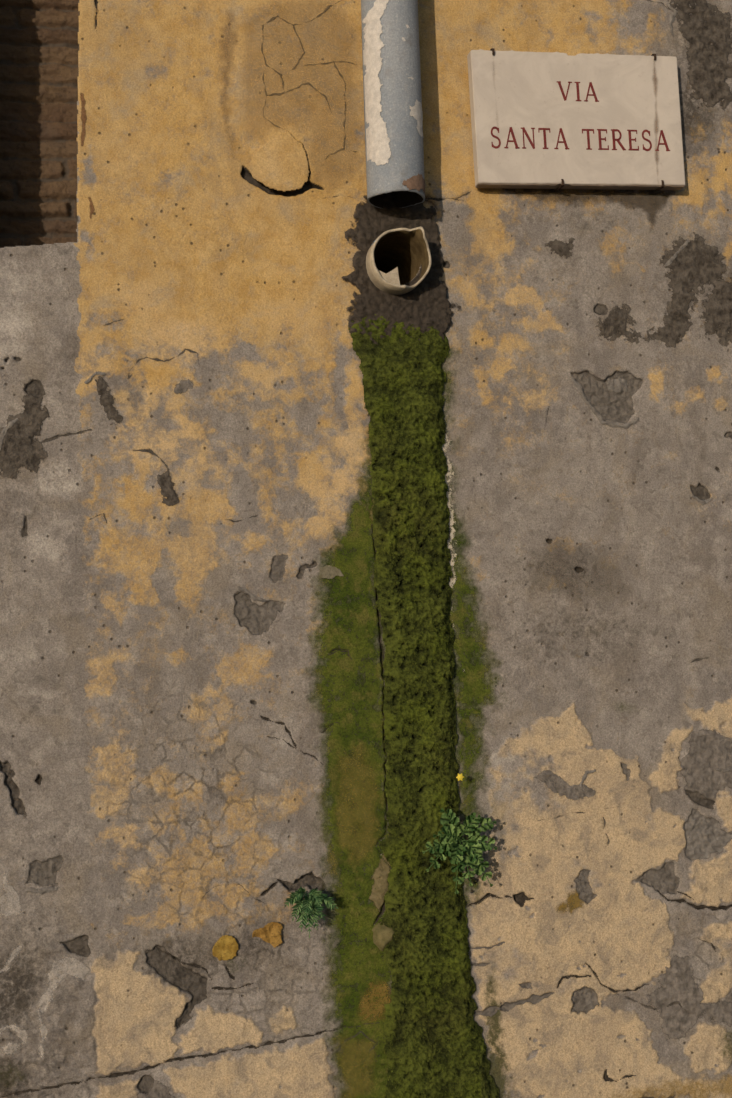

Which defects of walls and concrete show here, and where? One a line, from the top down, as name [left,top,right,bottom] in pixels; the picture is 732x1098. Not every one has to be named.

spalling [648,0,732,110]
crack [241,143,353,198]
spalling [594,232,732,347]
spalling [0,378,92,479]
damp [442,418,457,588]
damp [336,748,378,860]
spalling [681,729,732,860]
crack [657,890,732,911]
crack [471,942,505,966]
crack [474,992,554,1017]
spalling [557,955,732,1040]
crack [2,1022,379,1097]